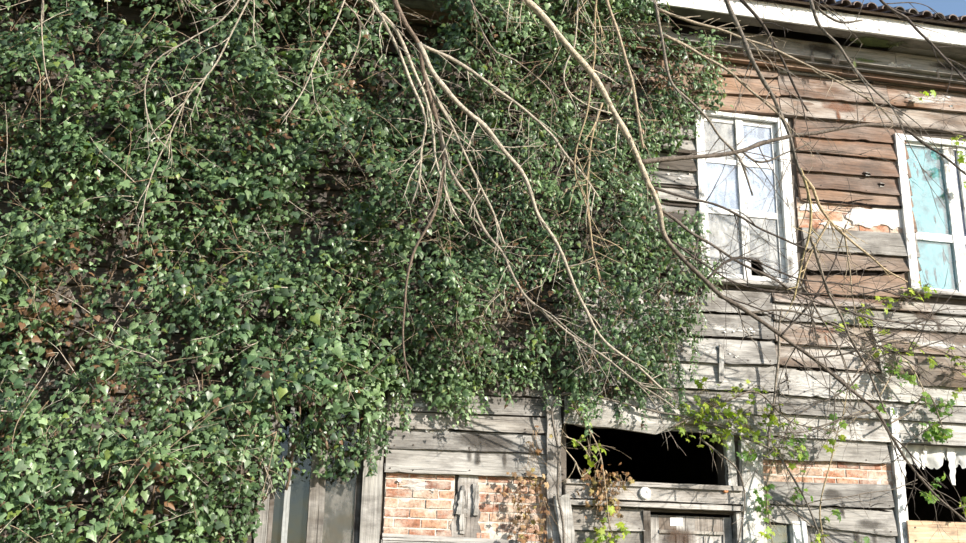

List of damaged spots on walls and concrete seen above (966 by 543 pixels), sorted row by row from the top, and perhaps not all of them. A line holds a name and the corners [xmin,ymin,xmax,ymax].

flaking render [796,197,903,233]
flaking render [383,472,455,537]
flaking render [477,476,546,542]